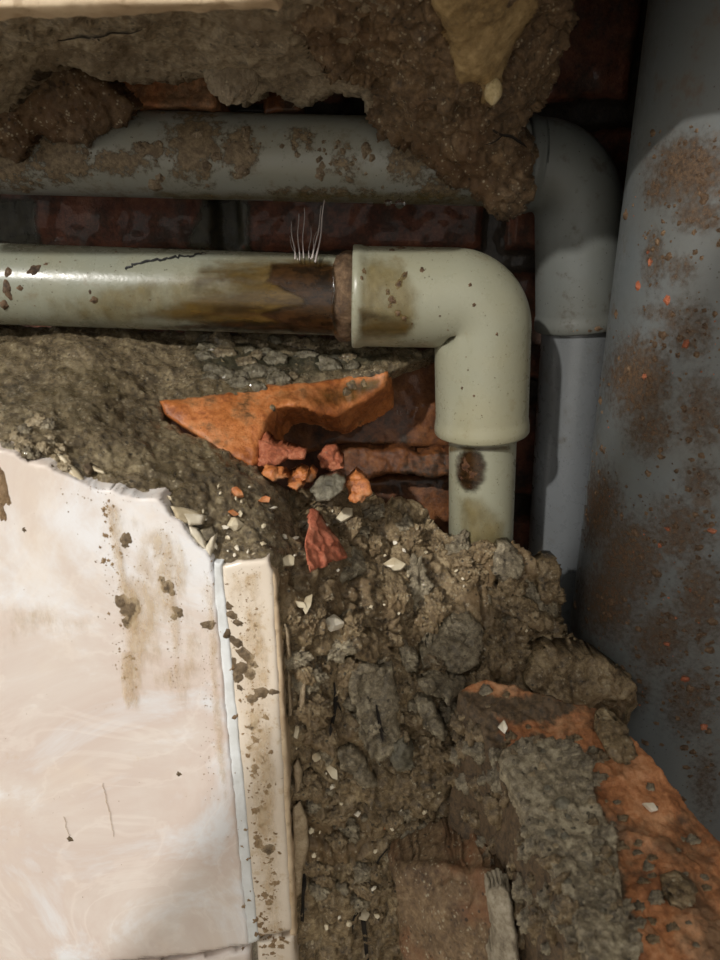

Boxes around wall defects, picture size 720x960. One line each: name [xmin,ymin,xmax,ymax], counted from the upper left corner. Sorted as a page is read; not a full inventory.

flaking render [123,78,230,112]
corrosion [165,260,337,335]
spalling [160,371,394,473]
spalling [51,452,106,480]
corrosion [449,447,506,490]
spalling [167,484,266,557]
peeling [336,507,353,523]
peeling [283,554,297,566]
peeling [296,594,312,614]
peeling [326,614,344,632]
peeling [284,623,306,739]
peeling [312,752,338,780]